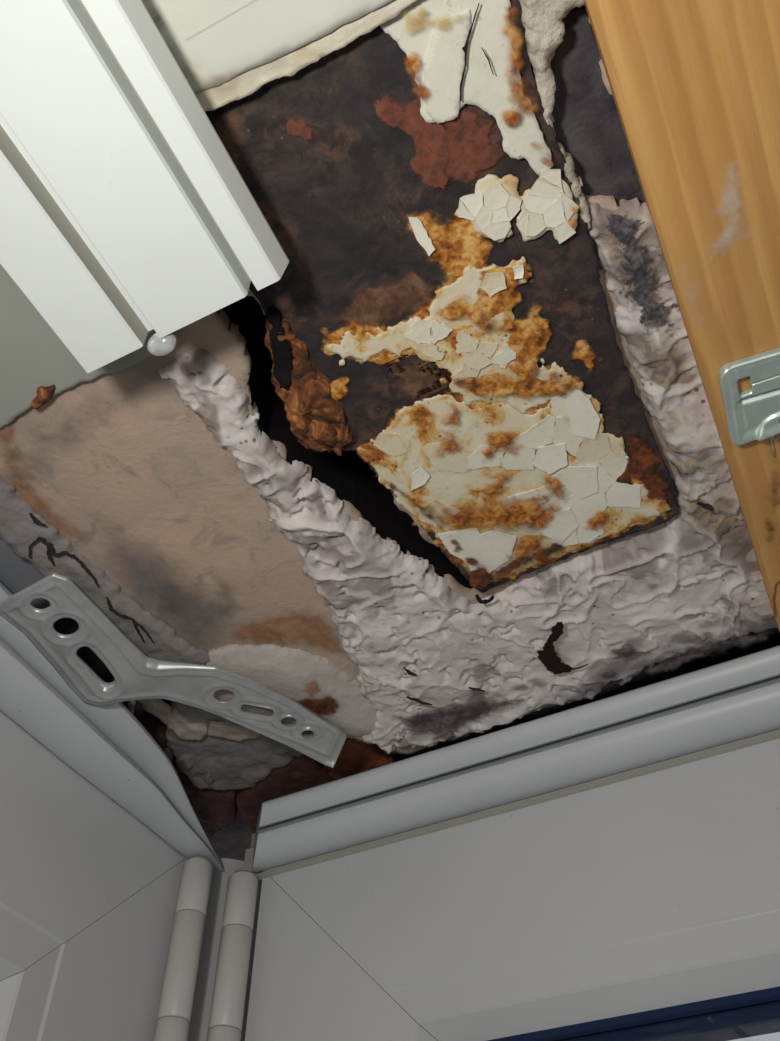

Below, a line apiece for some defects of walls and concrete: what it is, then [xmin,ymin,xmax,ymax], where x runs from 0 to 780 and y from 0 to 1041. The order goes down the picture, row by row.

corrosion [374,9,535,189]
crack [460,3,494,101]
peeling [380,0,591,244]
crack [28,513,154,643]
corrosion [265,306,353,456]
peeling [408,217,435,256]
corrosion [322,214,578,458]
peeling [326,256,671,581]
corrosion [387,473,667,589]
corrosion [573,340,601,369]
damp [600,213,678,333]
corrosion [616,438,672,500]